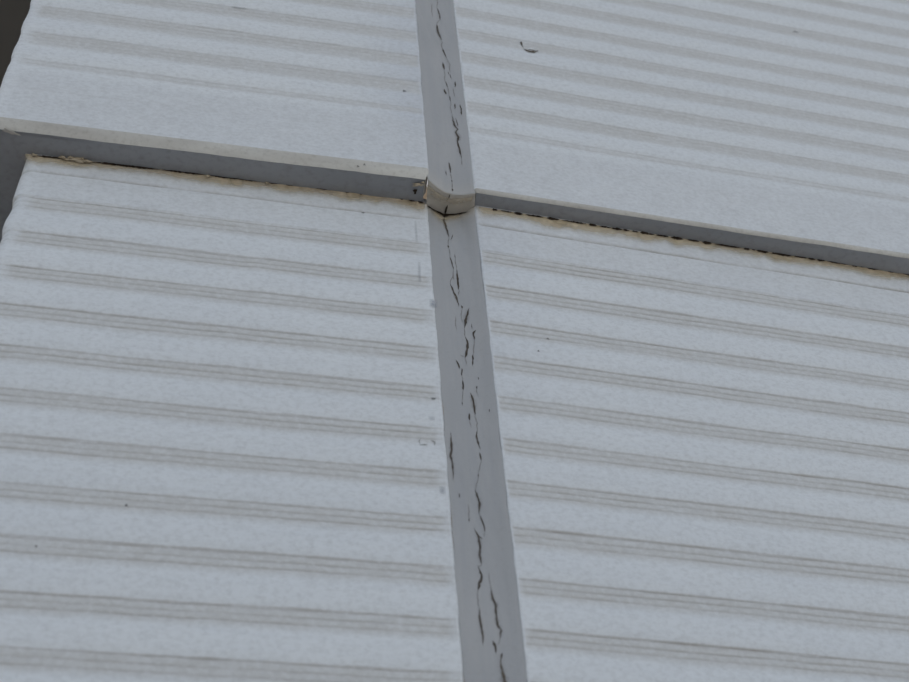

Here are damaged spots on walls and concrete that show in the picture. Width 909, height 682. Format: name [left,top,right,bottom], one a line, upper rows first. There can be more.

crack [96,162,293,186]
crack [492,208,909,275]
crack [401,0,506,682]